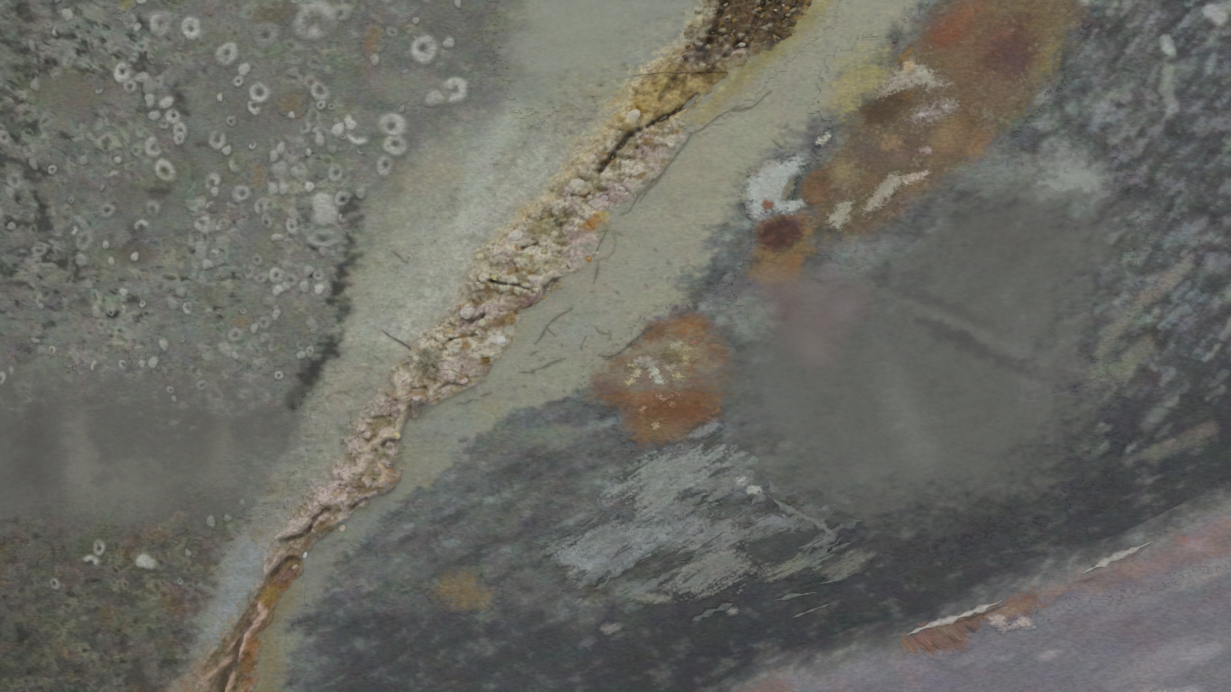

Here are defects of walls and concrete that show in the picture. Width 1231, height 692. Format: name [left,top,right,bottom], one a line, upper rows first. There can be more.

crack [593,90,772,284]
corrosion [743,0,1095,263]
crack [381,330,411,351]
crack [518,308,653,373]
corrosion [577,298,738,459]
spalling [897,580,1050,661]